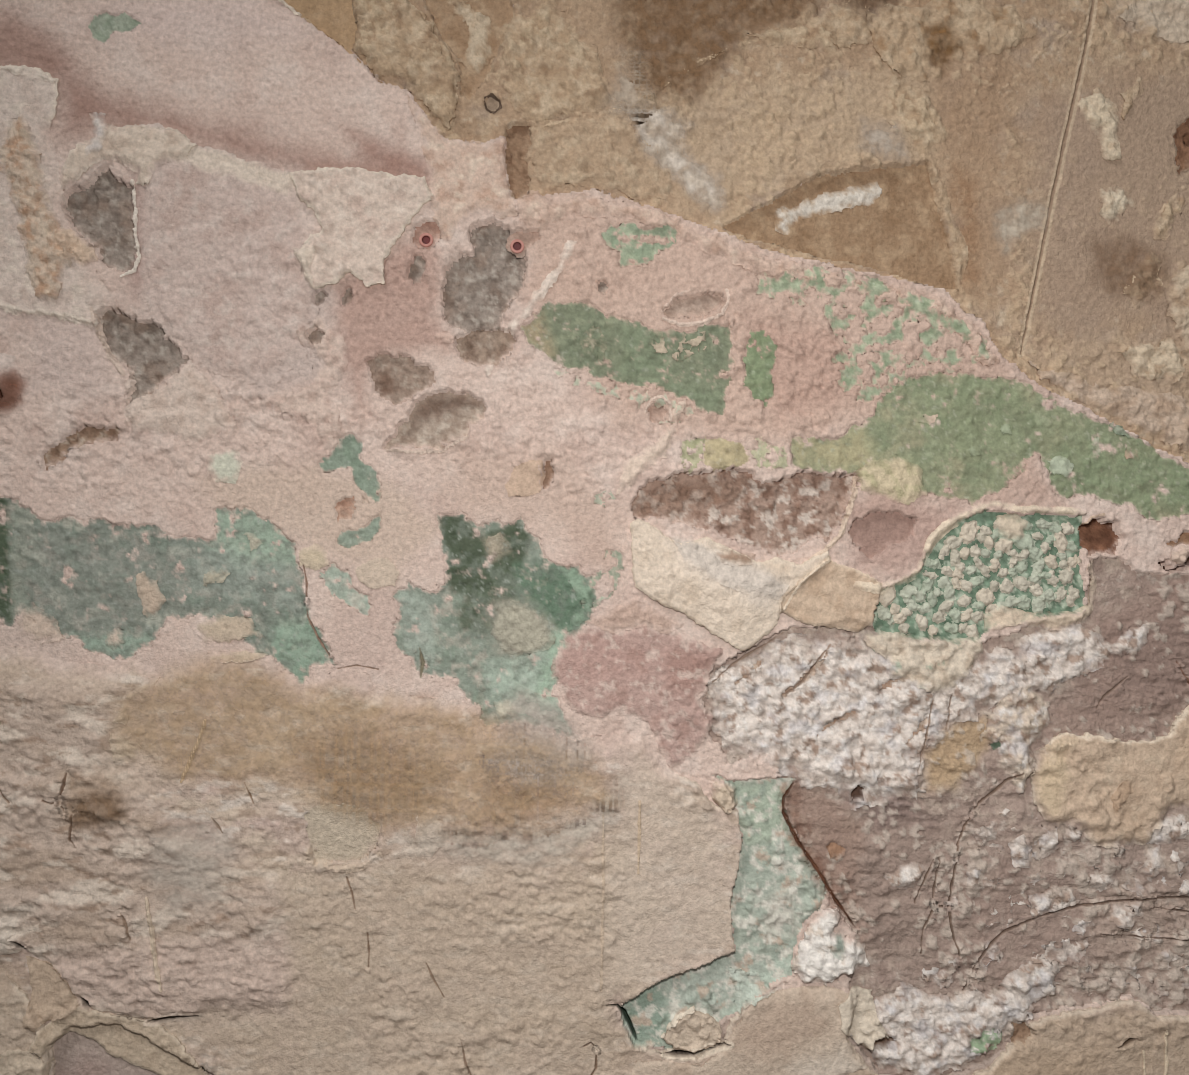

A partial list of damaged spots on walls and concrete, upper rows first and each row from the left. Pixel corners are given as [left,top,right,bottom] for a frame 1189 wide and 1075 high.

rust [0,379,21,409]
flaking render [0,0,1189,508]
crack [1016,0,1100,359]
leakage [451,799,616,863]
peeling [0,354,1189,1075]
crack [910,768,1189,996]